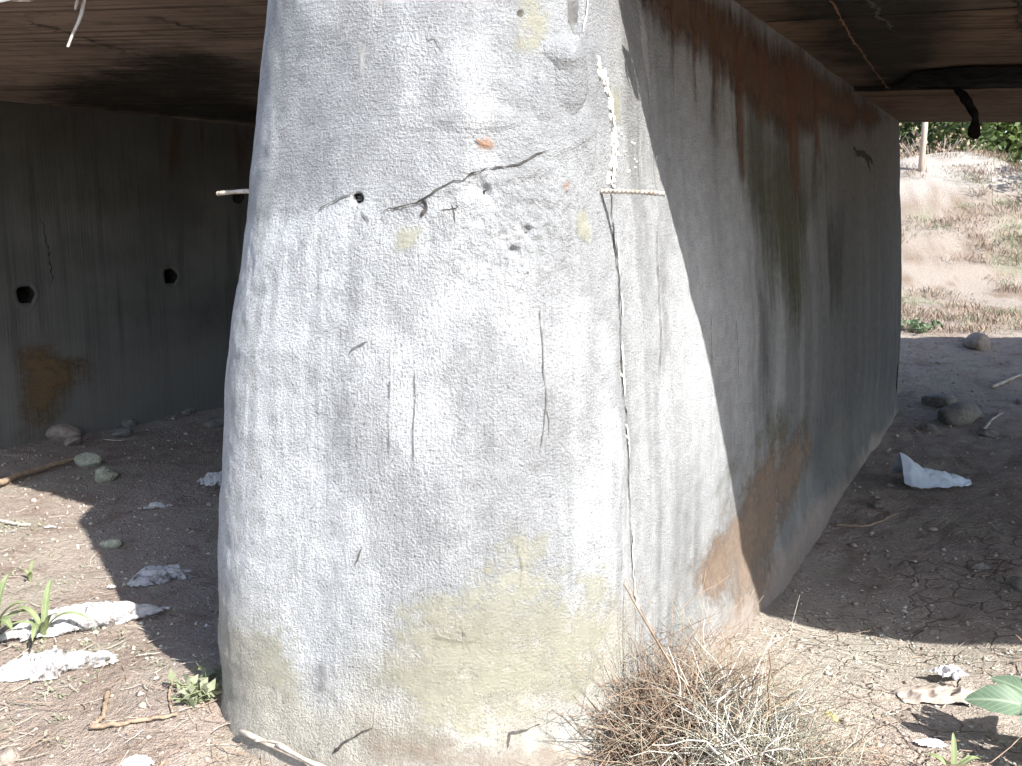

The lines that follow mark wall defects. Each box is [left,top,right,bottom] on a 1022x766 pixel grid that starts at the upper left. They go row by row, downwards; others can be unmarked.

crack [319,149,552,222]
crack [597,55,650,609]